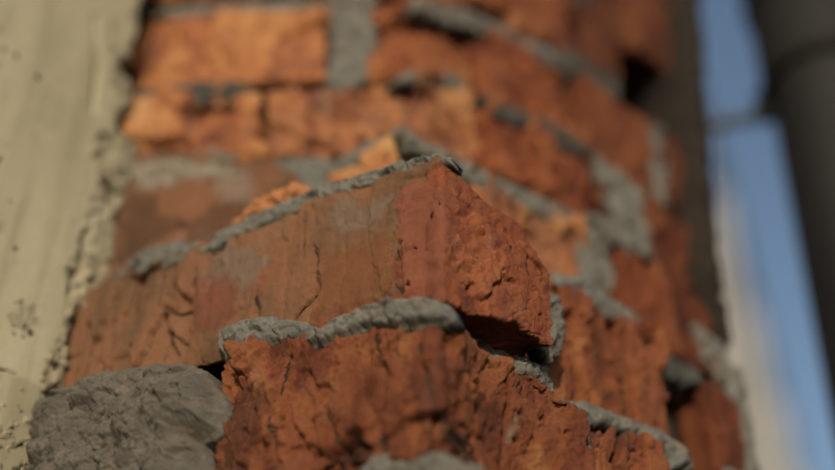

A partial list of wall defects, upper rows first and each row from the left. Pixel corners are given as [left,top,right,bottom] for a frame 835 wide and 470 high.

crack [164,274,198,353]
crack [254,290,262,316]
crack [299,212,321,317]
crack [389,248,404,295]